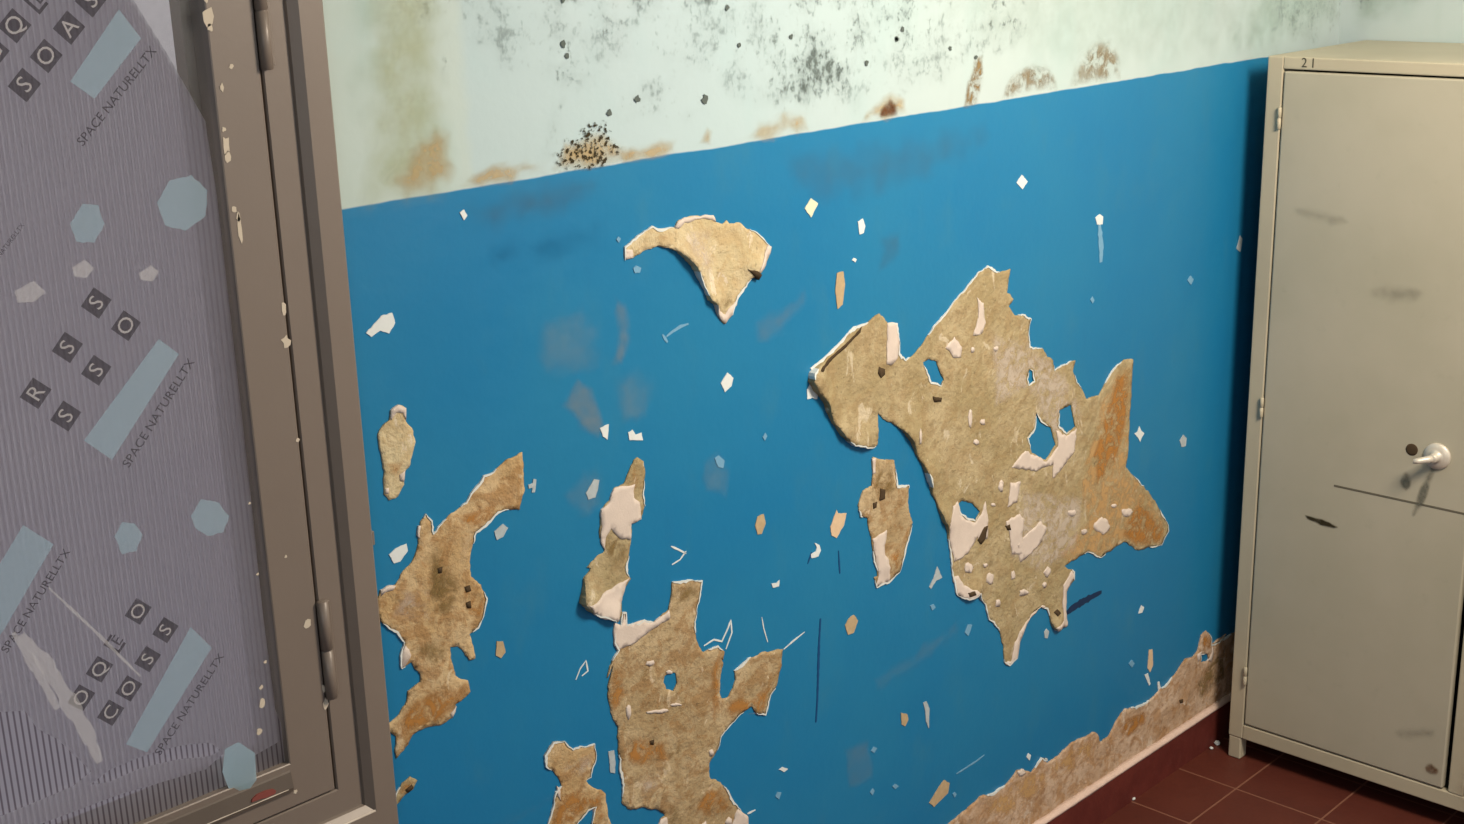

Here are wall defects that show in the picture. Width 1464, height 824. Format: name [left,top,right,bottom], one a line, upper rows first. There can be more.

water stain [1087,49,1115,75]
water stain [557,109,665,169]
peeling [616,215,772,324]
peeling [377,404,416,500]
peeling [807,258,1169,666]
peeling [378,452,536,758]
peeling [544,430,783,824]
peeling [901,701,930,728]
flaking render [929,630,1235,824]